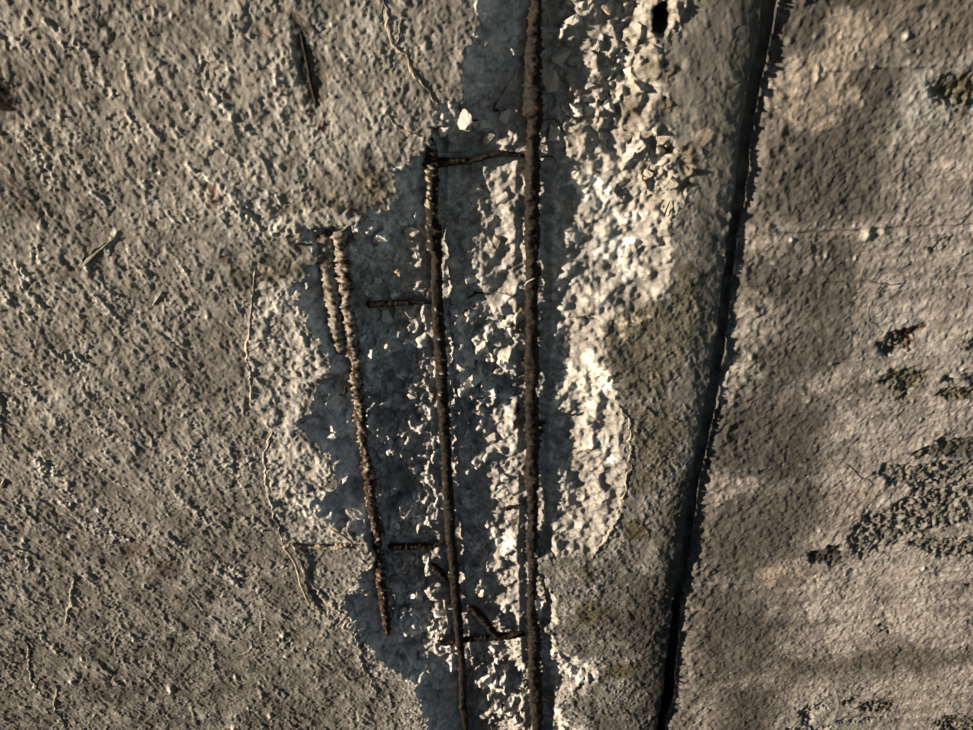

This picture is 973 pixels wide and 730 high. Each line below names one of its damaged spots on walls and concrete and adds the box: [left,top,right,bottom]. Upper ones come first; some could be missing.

spalling [272,12,328,127]
crack [638,34,665,46]
leakage [776,0,830,66]
leakage [931,0,973,55]
leakage [774,106,900,218]
spalling [289,0,702,730]
leakage [739,264,850,389]
leakage [700,394,830,671]
leakage [714,688,783,730]
leakage [780,649,972,680]